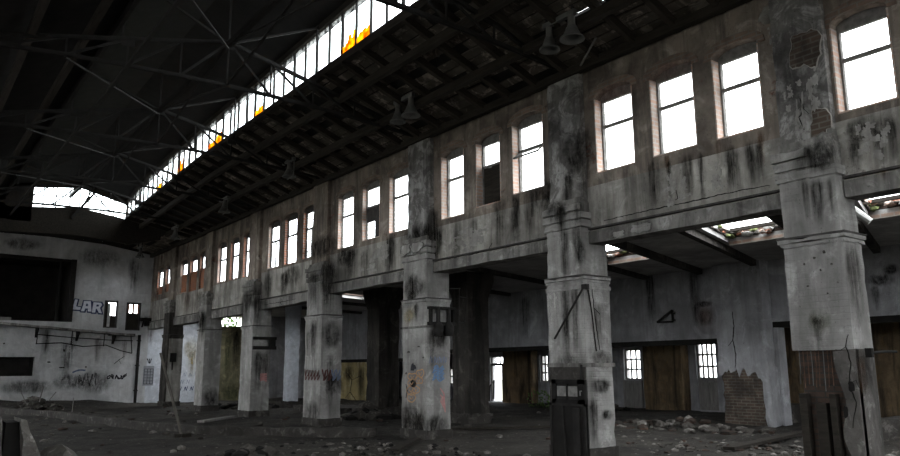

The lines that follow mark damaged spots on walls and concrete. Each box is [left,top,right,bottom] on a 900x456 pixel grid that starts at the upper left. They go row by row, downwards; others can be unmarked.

spalling [784,28,832,139]
leakage [682,155,703,191]
leakage [727,148,737,184]
leakage [747,143,762,174]
leakage [428,210,442,257]
leakage [557,157,588,266]
crack [728,312,736,367]
crack [835,335,860,426]